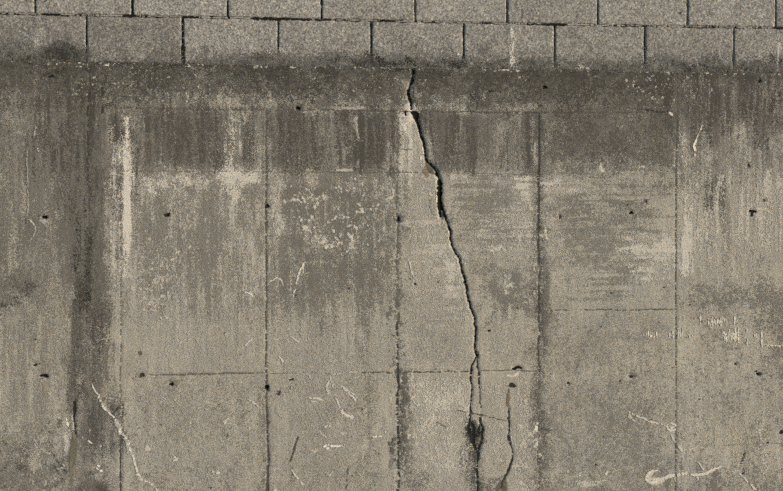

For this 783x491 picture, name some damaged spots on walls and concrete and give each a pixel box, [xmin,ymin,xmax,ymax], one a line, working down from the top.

crack [406,69,514,491]